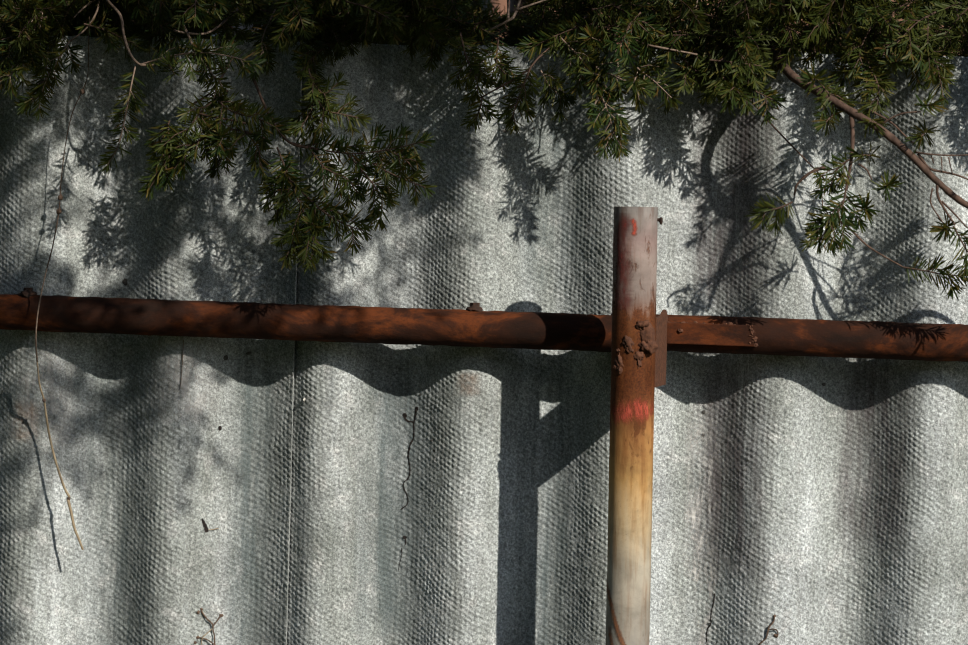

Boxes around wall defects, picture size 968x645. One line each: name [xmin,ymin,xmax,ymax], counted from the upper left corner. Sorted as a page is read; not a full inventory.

crack [400,407,418,510]